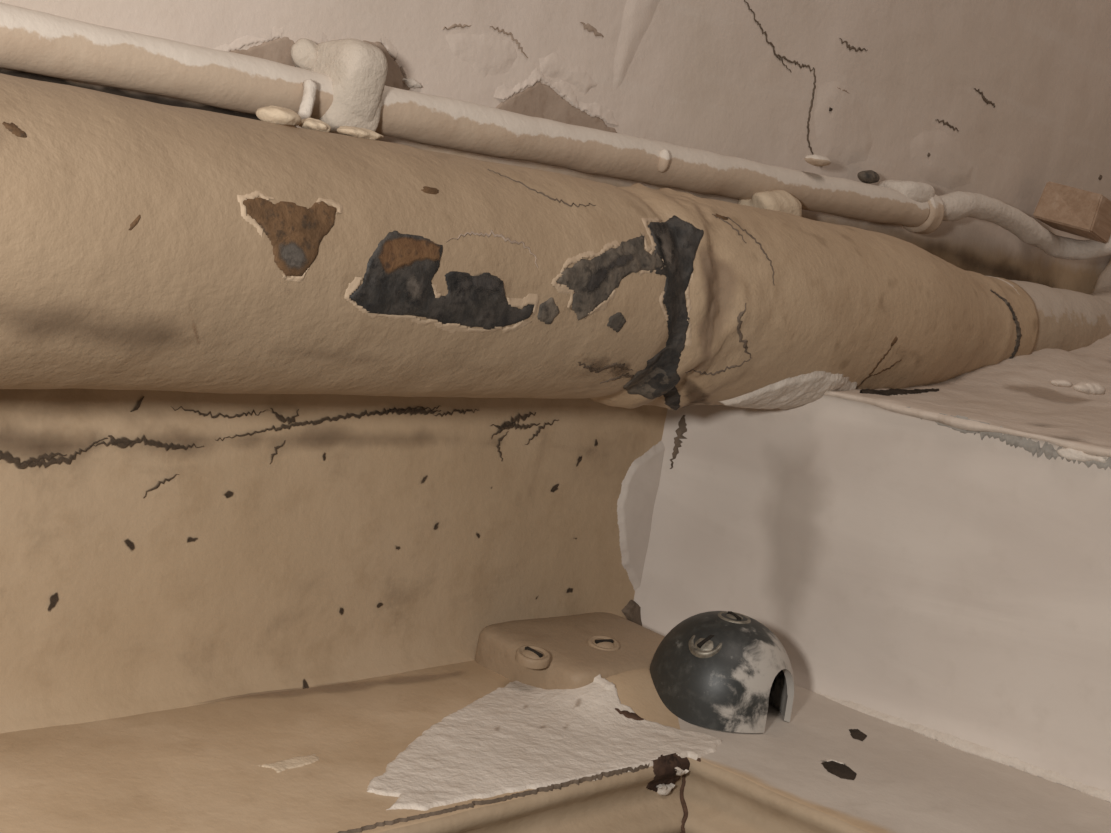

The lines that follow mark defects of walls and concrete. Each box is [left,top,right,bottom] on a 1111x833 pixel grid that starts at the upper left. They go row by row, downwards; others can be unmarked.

spalling [213,26,295,67]
spalling [363,34,422,90]
spalling [443,22,618,133]
crack [744,0,822,167]
corrosion [237,191,343,282]
peeling [537,215,708,410]
crack [857,337,901,387]
peeling [258,754,319,773]
crack [337,764,649,833]
peeling [367,674,722,833]